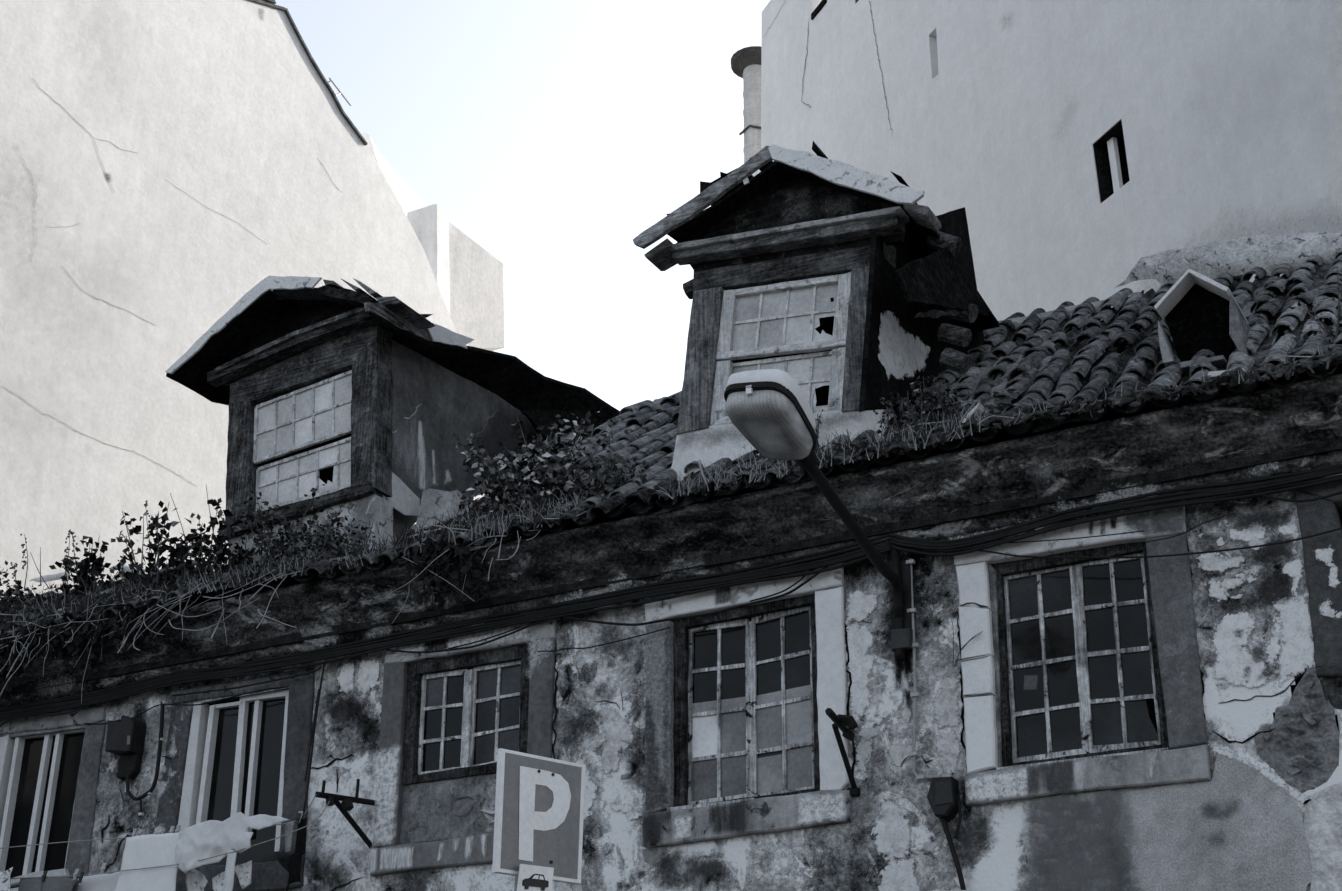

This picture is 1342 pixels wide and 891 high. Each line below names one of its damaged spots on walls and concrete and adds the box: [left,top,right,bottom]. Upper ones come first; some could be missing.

crack [32,78,137,185]
crack [766,0,811,108]
crack [869,2,893,135]
damp [715,587,731,604]
peeling [337,660,382,694]
flaking render [1196,496,1342,891]
peeling [576,705,644,832]
damp [946,760,1135,891]